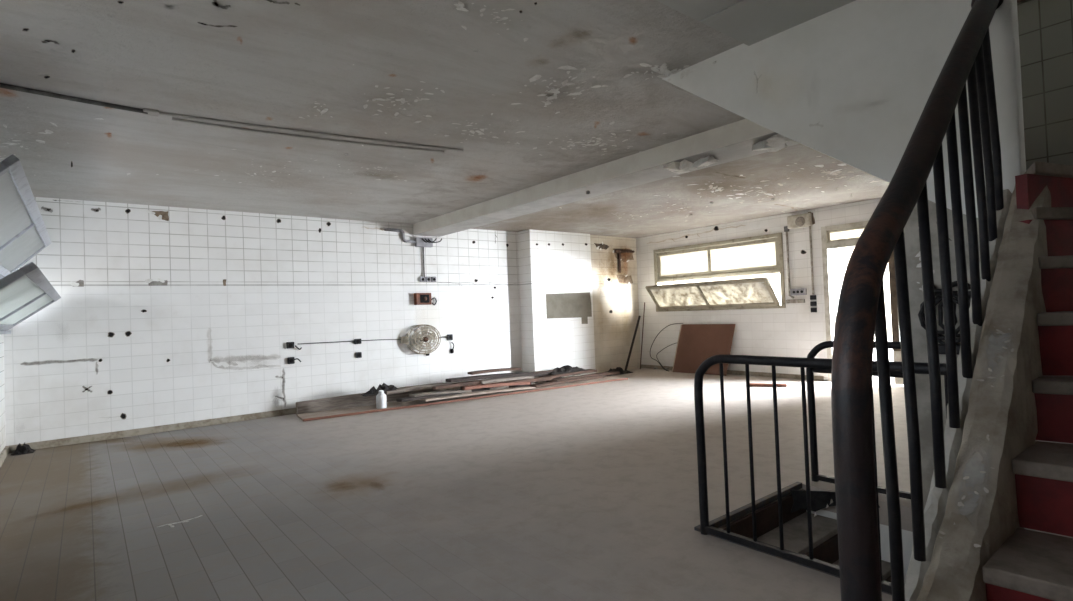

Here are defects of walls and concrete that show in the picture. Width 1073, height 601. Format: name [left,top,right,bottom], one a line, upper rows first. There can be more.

peeling [511,65,608,114]
spalling [617,156,878,226]